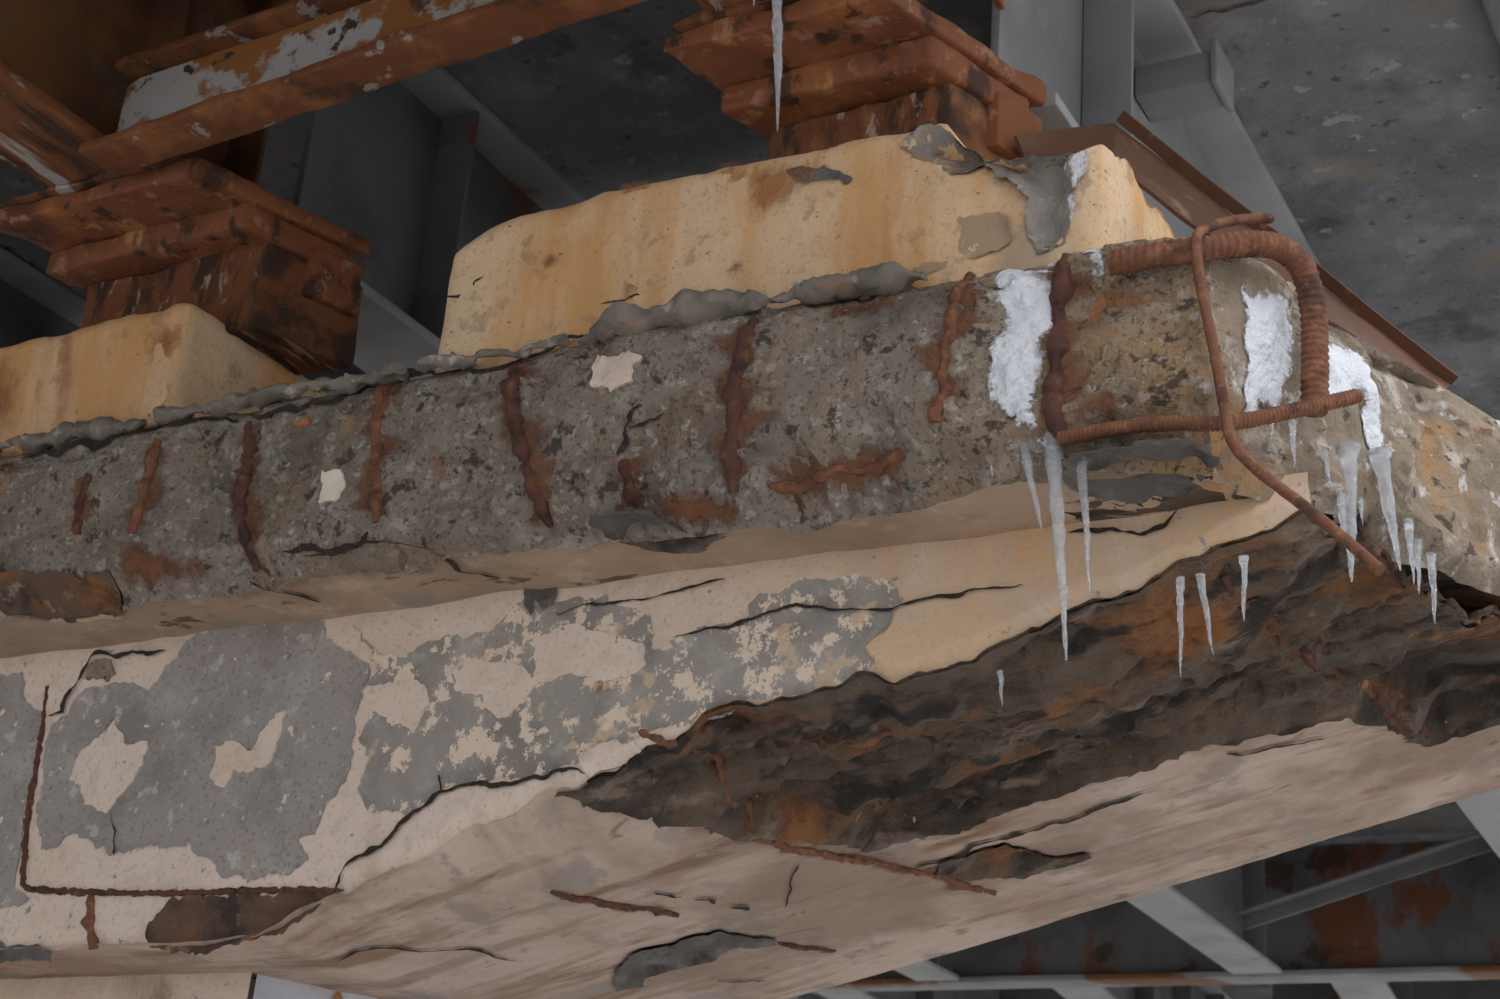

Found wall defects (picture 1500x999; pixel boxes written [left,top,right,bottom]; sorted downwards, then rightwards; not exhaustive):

corrosion [731,167,806,207]
peeling [786,165,853,185]
spalling [900,124,1073,254]
corrosion [657,494,738,526]
corrosion [123,546,203,588]
crack [282,532,499,578]
crack [555,578,725,615]
spalling [0,211,1500,956]
crack [673,584,1023,638]
crack [333,767,585,893]
spalling [0,942,53,964]
spalling [613,931,837,992]